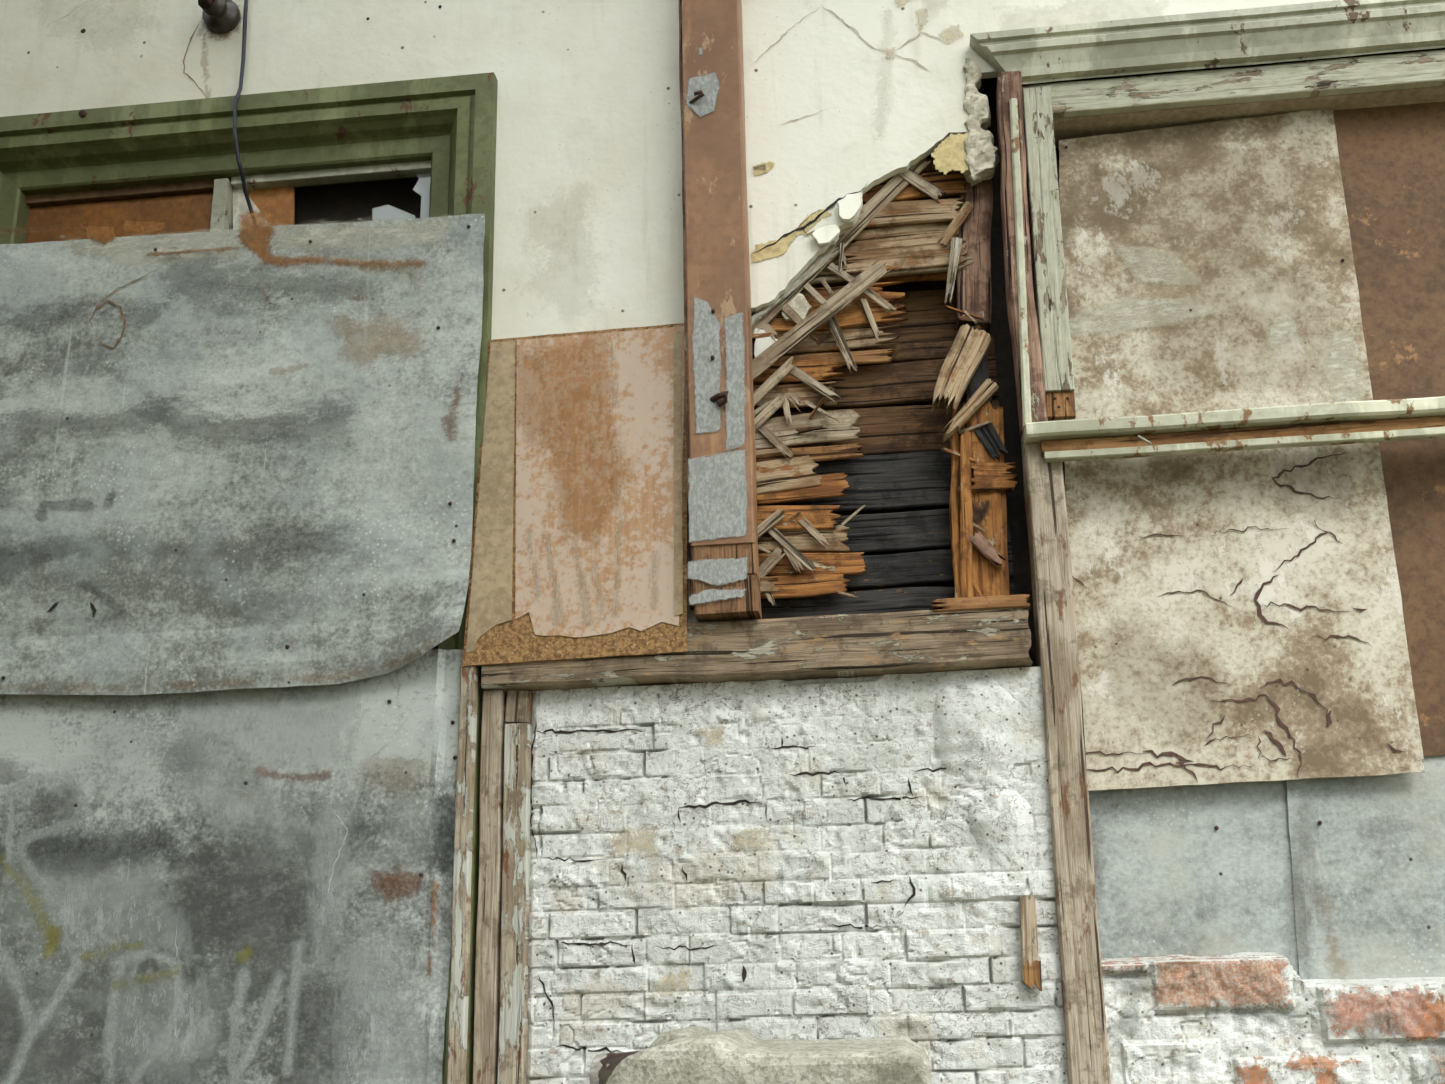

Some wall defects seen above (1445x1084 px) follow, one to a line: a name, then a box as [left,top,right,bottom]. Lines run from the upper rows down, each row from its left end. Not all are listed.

rust [147,209,425,267]
flaking render [751,58,1037,667]
crack [1137,452,1371,646]
crack [1086,676,1332,783]
crack [530,723,643,880]
crack [678,800,767,822]
crack [772,739,947,801]
crack [538,975,622,1053]
crack [557,941,747,982]
flaking render [1101,954,1293,1011]
flaking render [1233,1052,1362,1084]
flaking render [1325,985,1445,1084]